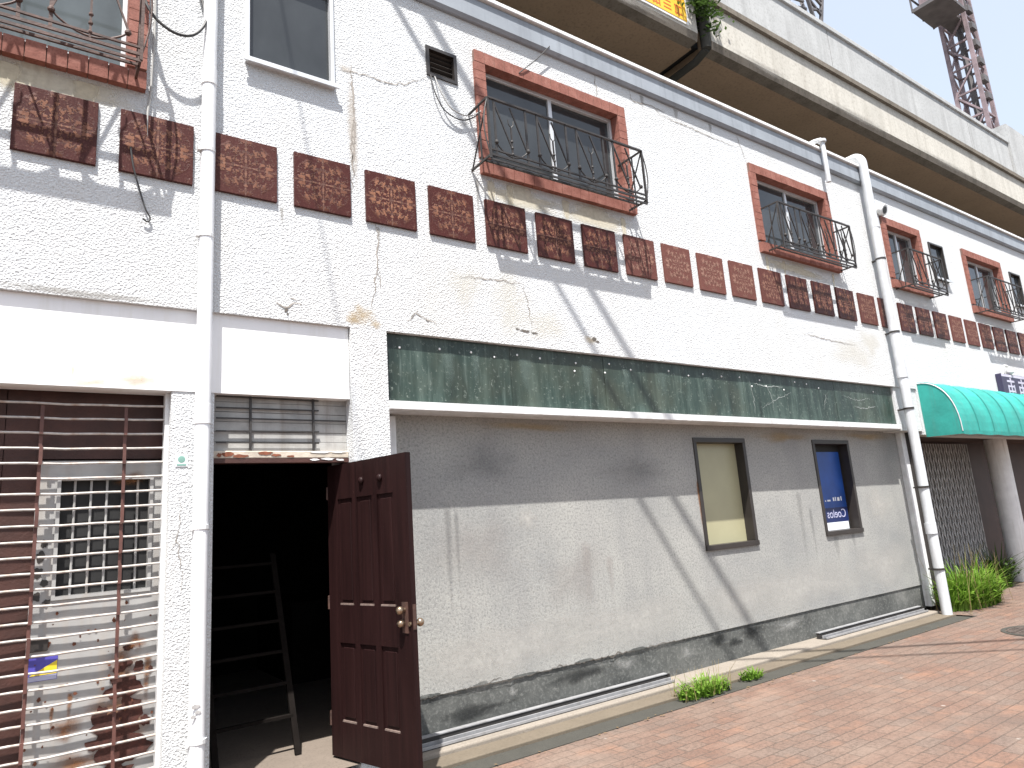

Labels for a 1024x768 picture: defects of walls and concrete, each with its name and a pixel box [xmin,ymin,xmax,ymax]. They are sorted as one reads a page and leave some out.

crack [340,65,425,191]
crack [371,228,381,306]
corrosion [30,697,73,736]
corrosion [66,636,153,768]
leakage [460,703,500,720]
leakage [568,668,597,681]